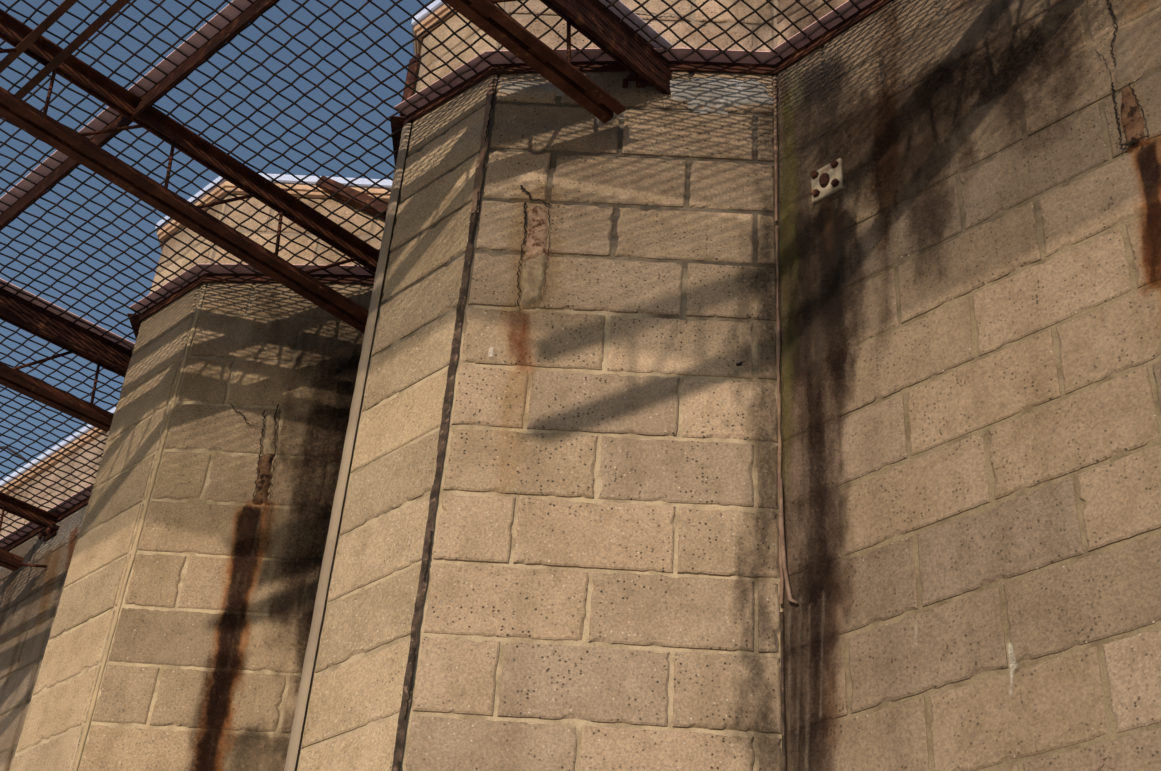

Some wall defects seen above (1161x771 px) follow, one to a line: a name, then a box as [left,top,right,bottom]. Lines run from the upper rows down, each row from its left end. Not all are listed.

crack [1095,0,1149,150]
spalling [516,206,551,310]
corrosion [1135,142,1161,279]
crack [231,404,279,503]
corrosion [195,505,261,771]